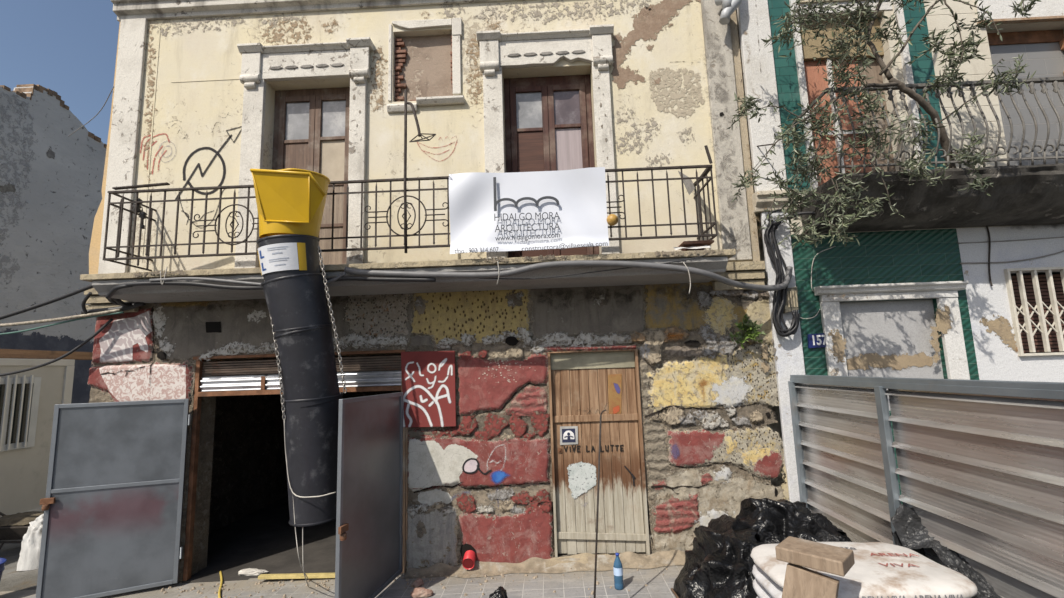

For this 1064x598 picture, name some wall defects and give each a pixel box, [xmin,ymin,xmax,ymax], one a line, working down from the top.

peeling [439,0,704,167]
peeling [150,306,176,360]
peeling [199,322,276,361]
peeling [247,309,267,323]
flaking render [687,285,770,311]
peeling [828,329,847,363]
peeling [930,304,953,366]
peeling [980,314,1018,353]
flaking render [333,324,740,442]
flaking render [645,404,778,433]